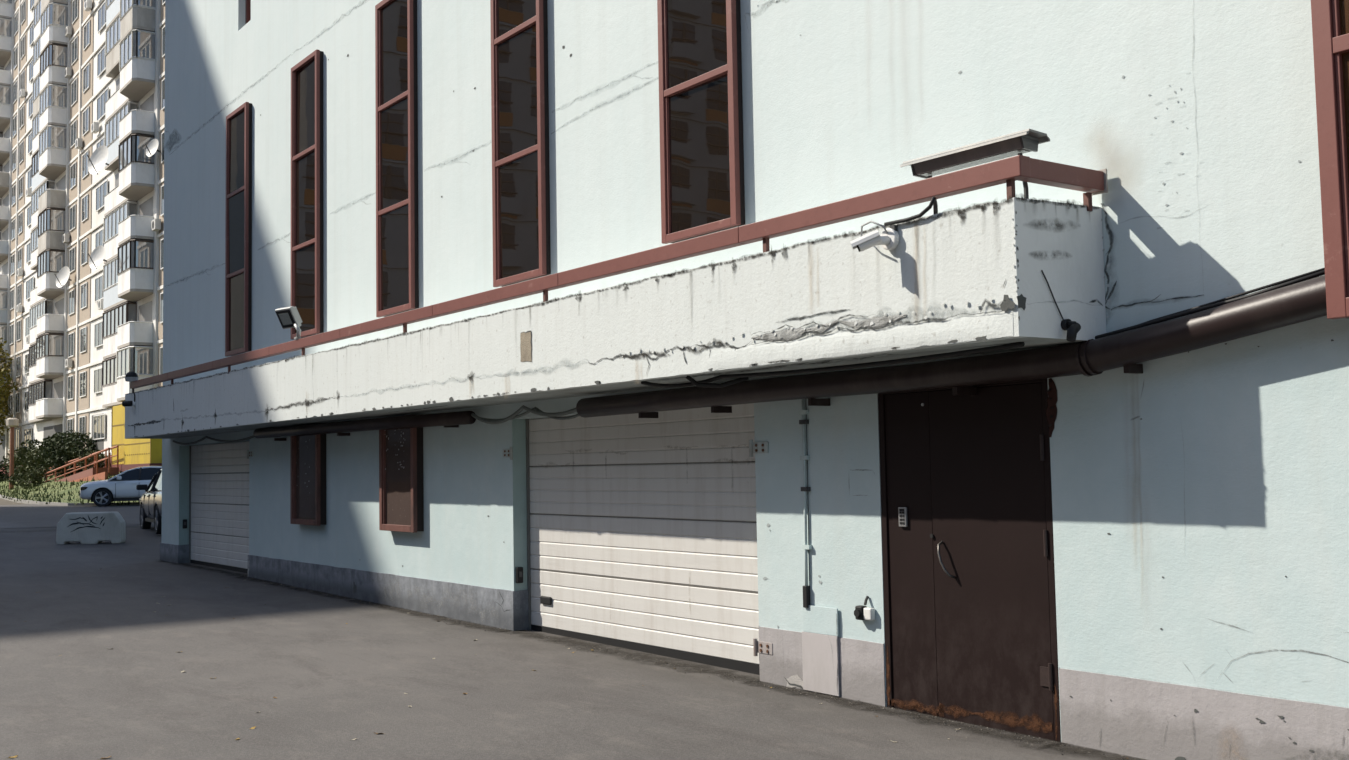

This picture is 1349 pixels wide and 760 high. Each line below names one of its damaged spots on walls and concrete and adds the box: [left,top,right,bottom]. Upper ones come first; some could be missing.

water stain [129,195,1099,394]
spalling [751,211,1026,345]
crack [1090,203,1201,318]
peeling [663,347,897,381]
rust [886,646,1057,738]